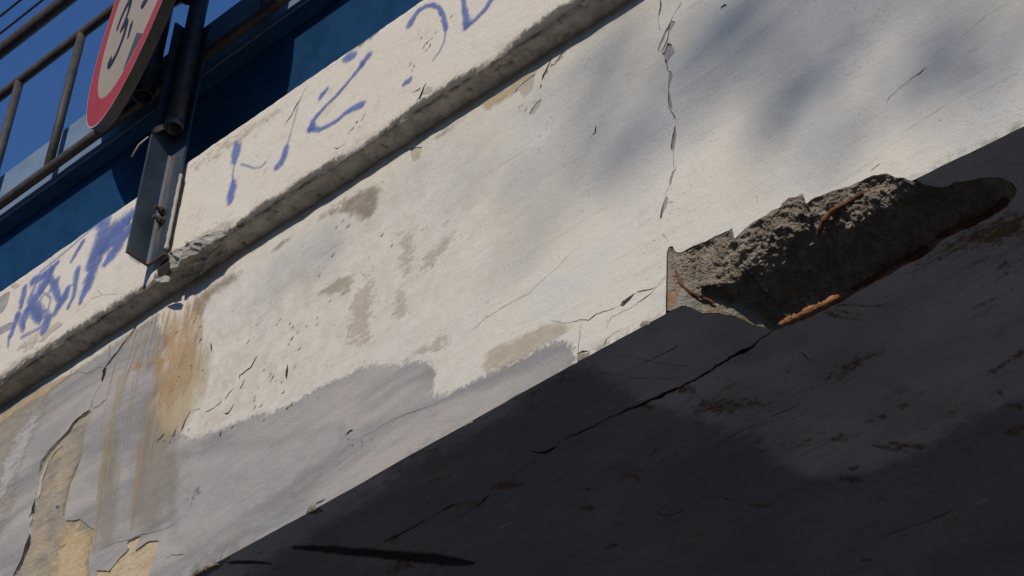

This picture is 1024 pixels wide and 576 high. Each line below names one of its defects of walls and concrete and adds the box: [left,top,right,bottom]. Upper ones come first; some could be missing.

crack [641,0,681,241]
spalling [667,173,1017,331]
peeling [0,394,48,526]
peeling [15,411,159,576]
corrosion [133,303,203,438]
crack [383,277,771,544]